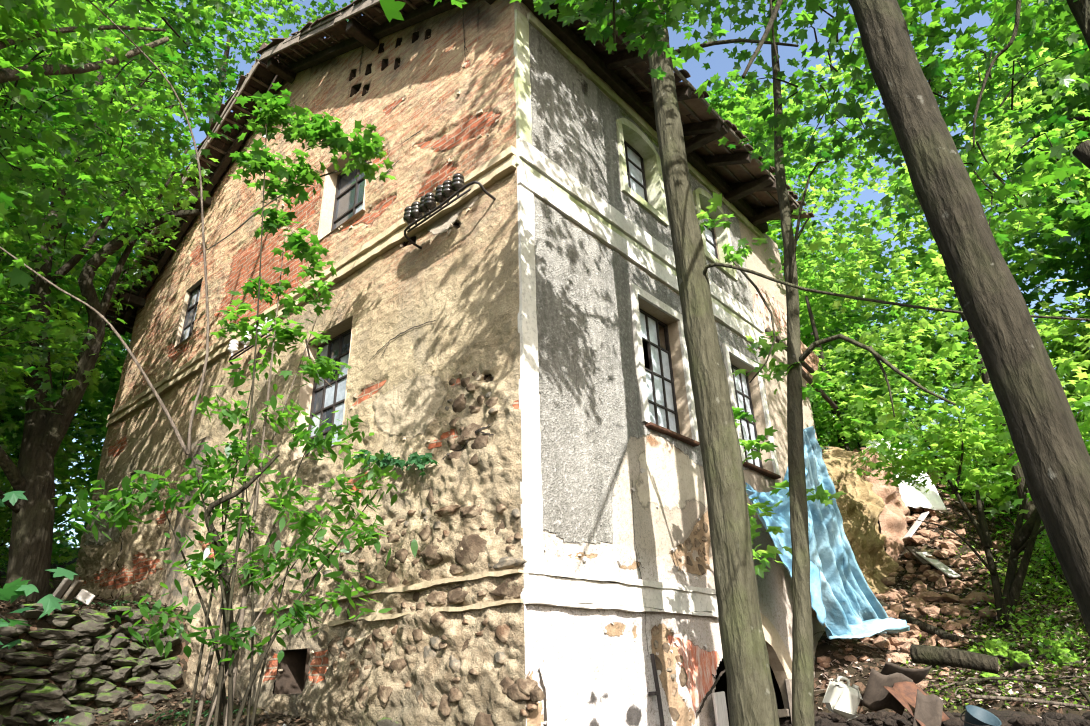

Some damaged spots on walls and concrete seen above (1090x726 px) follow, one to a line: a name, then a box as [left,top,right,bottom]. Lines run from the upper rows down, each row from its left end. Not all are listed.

flaking render [412,109,501,199]
flaking render [330,194,396,236]
crack [369,320,435,361]
flaking render [349,369,498,466]
flaking render [630,435,711,580]
flaking render [568,552,598,562]
spalling [308,489,547,726]
flaking render [603,622,637,641]
flaking render [262,653,283,682]
crack [538,669,547,726]
damp [626,705,642,726]
flaking render [651,623,719,726]